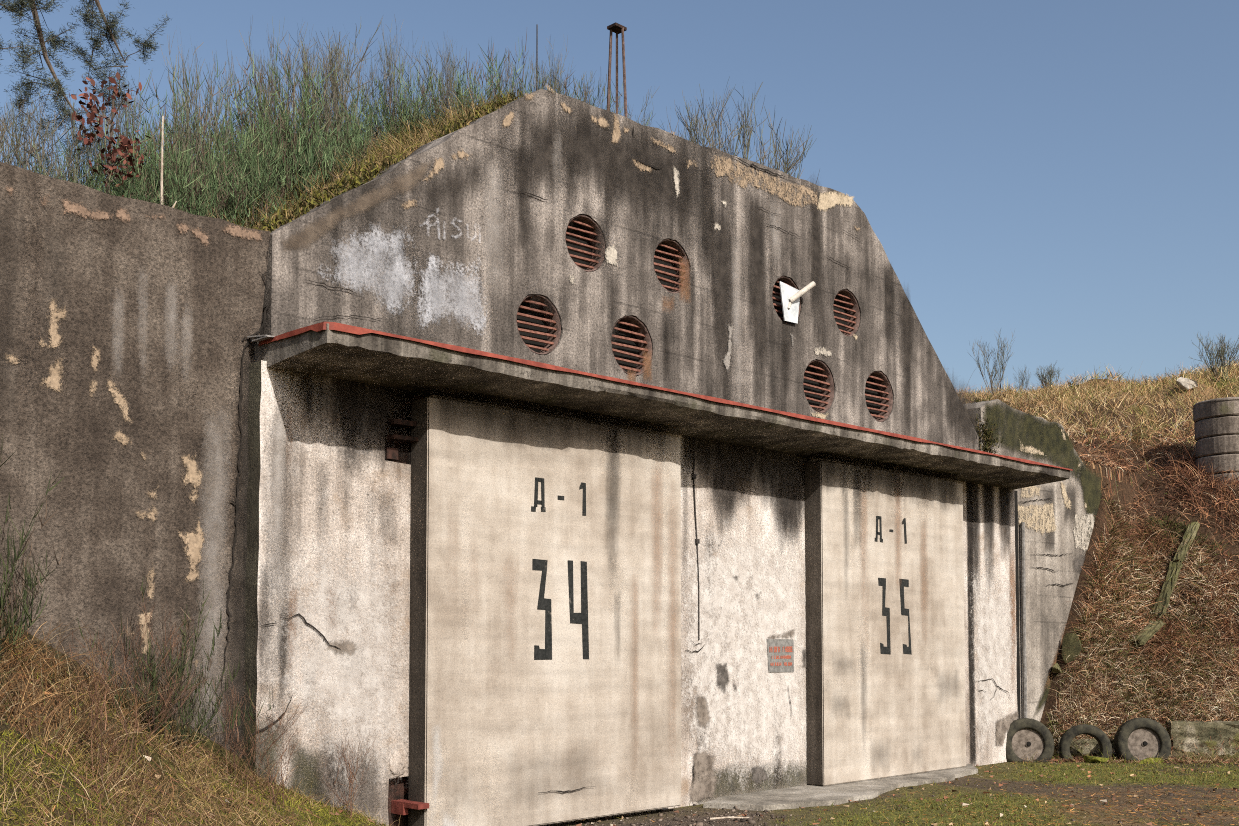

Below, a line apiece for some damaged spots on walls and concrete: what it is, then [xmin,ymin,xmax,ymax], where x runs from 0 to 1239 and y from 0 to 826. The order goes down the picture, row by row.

peeling [711,156,854,212]
peeling [39,300,66,391]
crack [305,279,386,320]
damp [750,203,766,397]
damp [810,184,824,339]
damp [884,269,911,416]
peeling [89,346,132,445]
peeling [182,454,202,502]
crack [221,234,276,701]
peeling [179,521,204,581]
crack [261,613,341,650]
damp [683,436,1010,763]